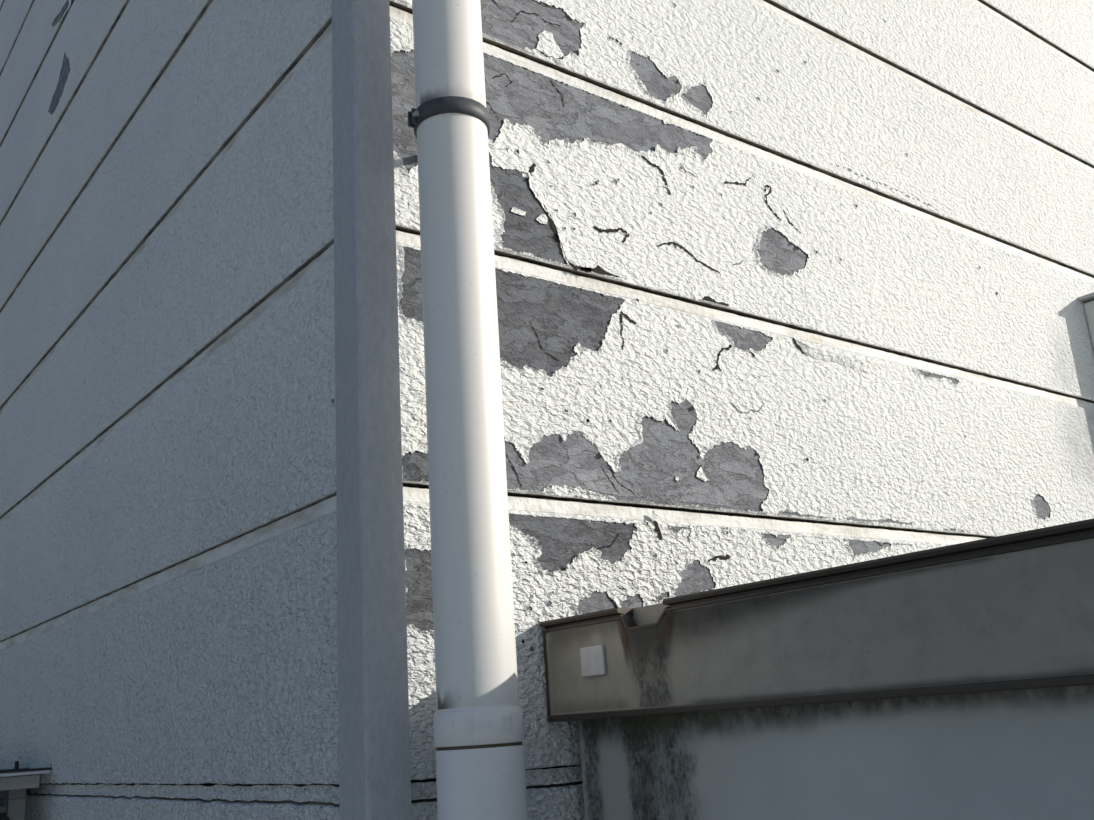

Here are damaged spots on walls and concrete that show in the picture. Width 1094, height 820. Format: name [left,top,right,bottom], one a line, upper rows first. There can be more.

peeling [480,0,587,66]
peeling [483,52,714,280]
crack [594,222,631,243]
crack [656,237,743,273]
crack [642,151,801,233]
peeling [495,268,640,392]
crack [620,308,638,350]
crack [710,340,756,371]
peeling [504,396,912,527]
peeling [509,513,649,577]
leakage [626,584,835,707]
leakage [623,720,696,820]